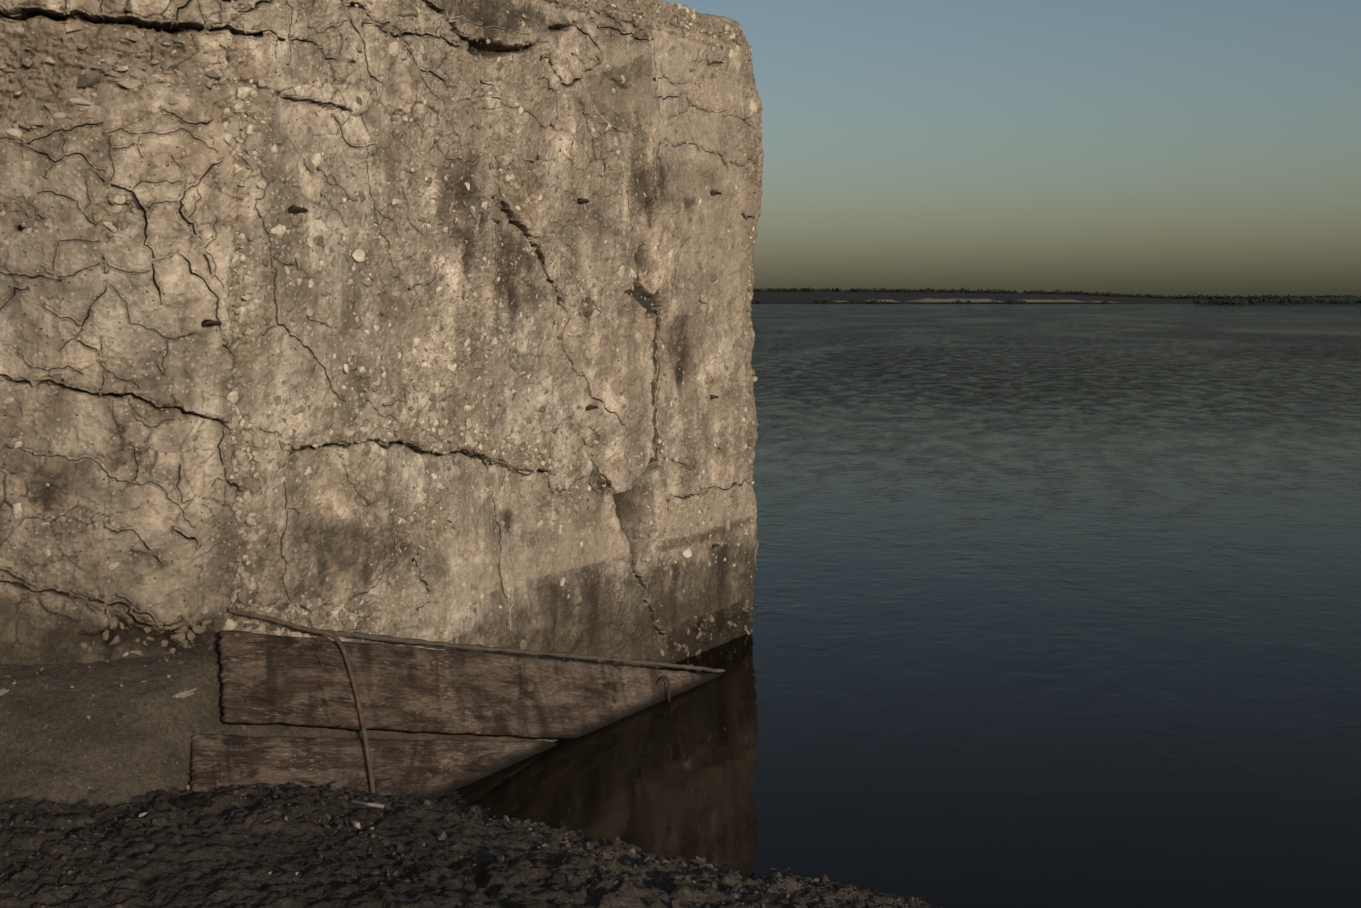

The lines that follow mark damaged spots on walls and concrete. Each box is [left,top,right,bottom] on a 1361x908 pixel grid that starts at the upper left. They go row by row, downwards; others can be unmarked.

spalling [0,0,756,669]
crack [0,0,759,638]